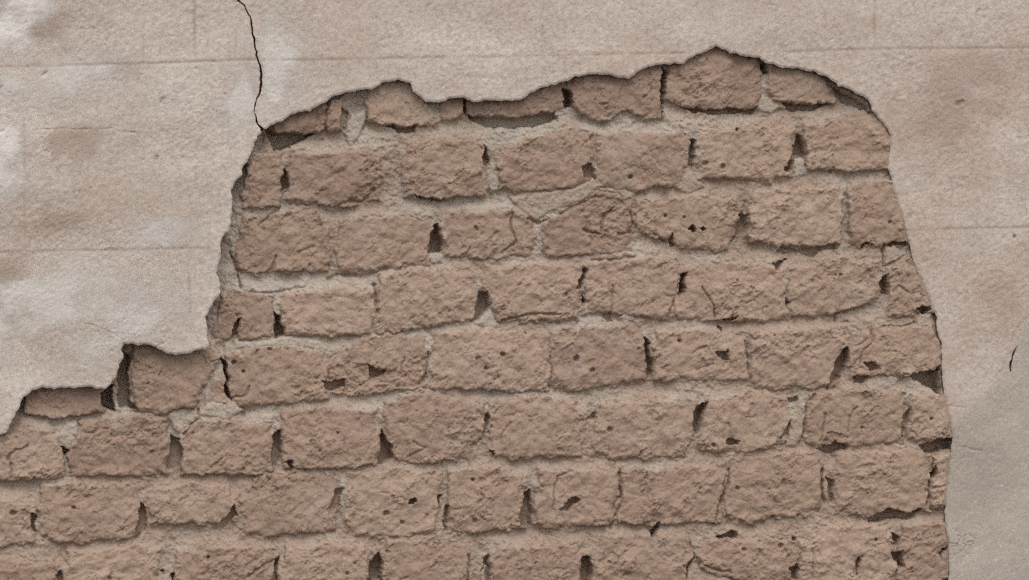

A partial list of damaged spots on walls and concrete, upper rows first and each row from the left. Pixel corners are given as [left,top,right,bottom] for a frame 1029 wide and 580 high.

crack [237,0,264,131]
flaking render [0,46,893,580]
crack [999,315,1029,374]